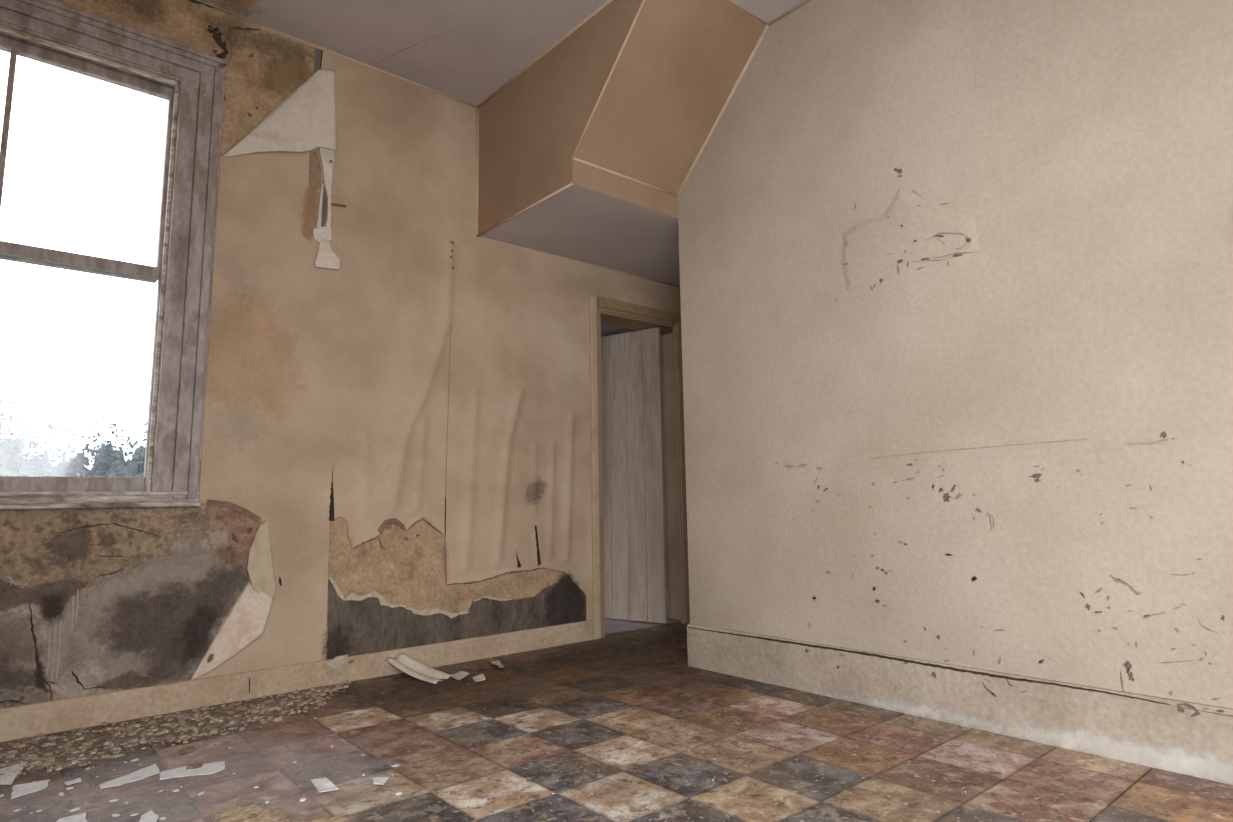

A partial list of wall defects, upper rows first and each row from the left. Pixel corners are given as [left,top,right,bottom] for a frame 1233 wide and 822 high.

flaking render [54,0,315,156]
damp [207,0,256,80]
damp [0,580,87,689]
flaking render [0,499,261,709]
damp [111,565,248,684]
flaking render [326,512,568,669]
damp [815,691,1233,783]